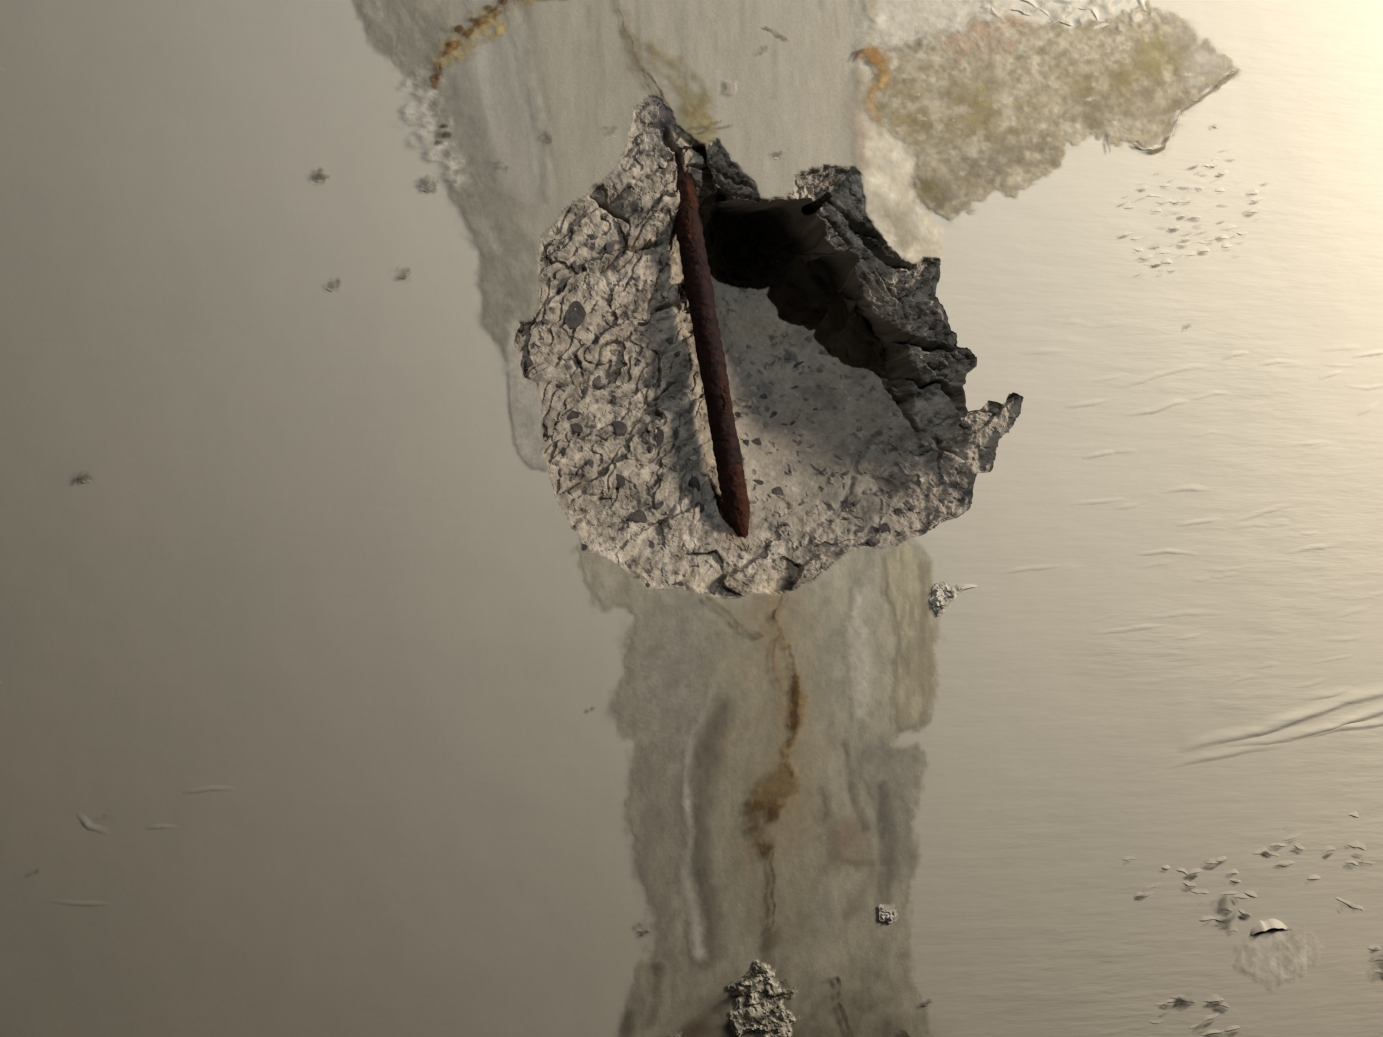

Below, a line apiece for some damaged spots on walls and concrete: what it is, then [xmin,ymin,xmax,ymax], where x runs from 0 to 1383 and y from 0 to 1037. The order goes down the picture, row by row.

corrosion [429,0,533,88]
crack [623,22,669,105]
peeling [866,0,1240,220]
spalling [514,95,1022,599]
crack [706,596,799,778]
damp [578,539,939,1037]
corrosion [747,646,807,857]